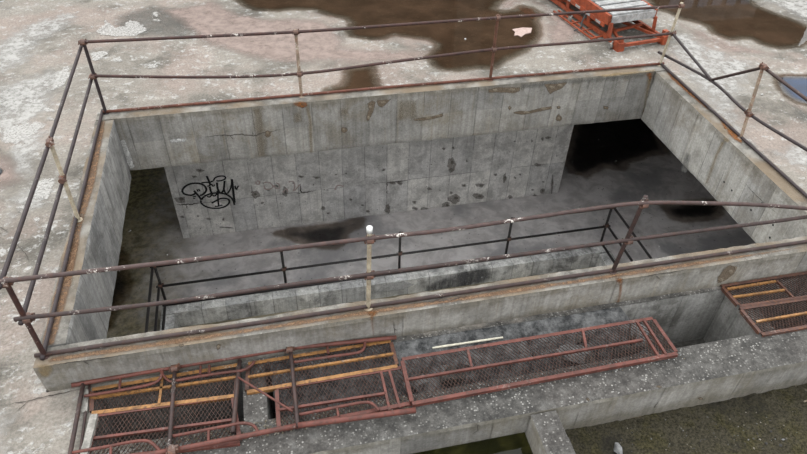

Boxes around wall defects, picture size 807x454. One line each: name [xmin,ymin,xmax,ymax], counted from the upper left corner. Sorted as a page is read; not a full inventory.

damp [121,4,419,61]
damp [549,15,578,43]
spalling [366,99,390,121]
spalling [508,106,562,121]
spalling [718,265,737,283]
corrosion [39,249,789,376]